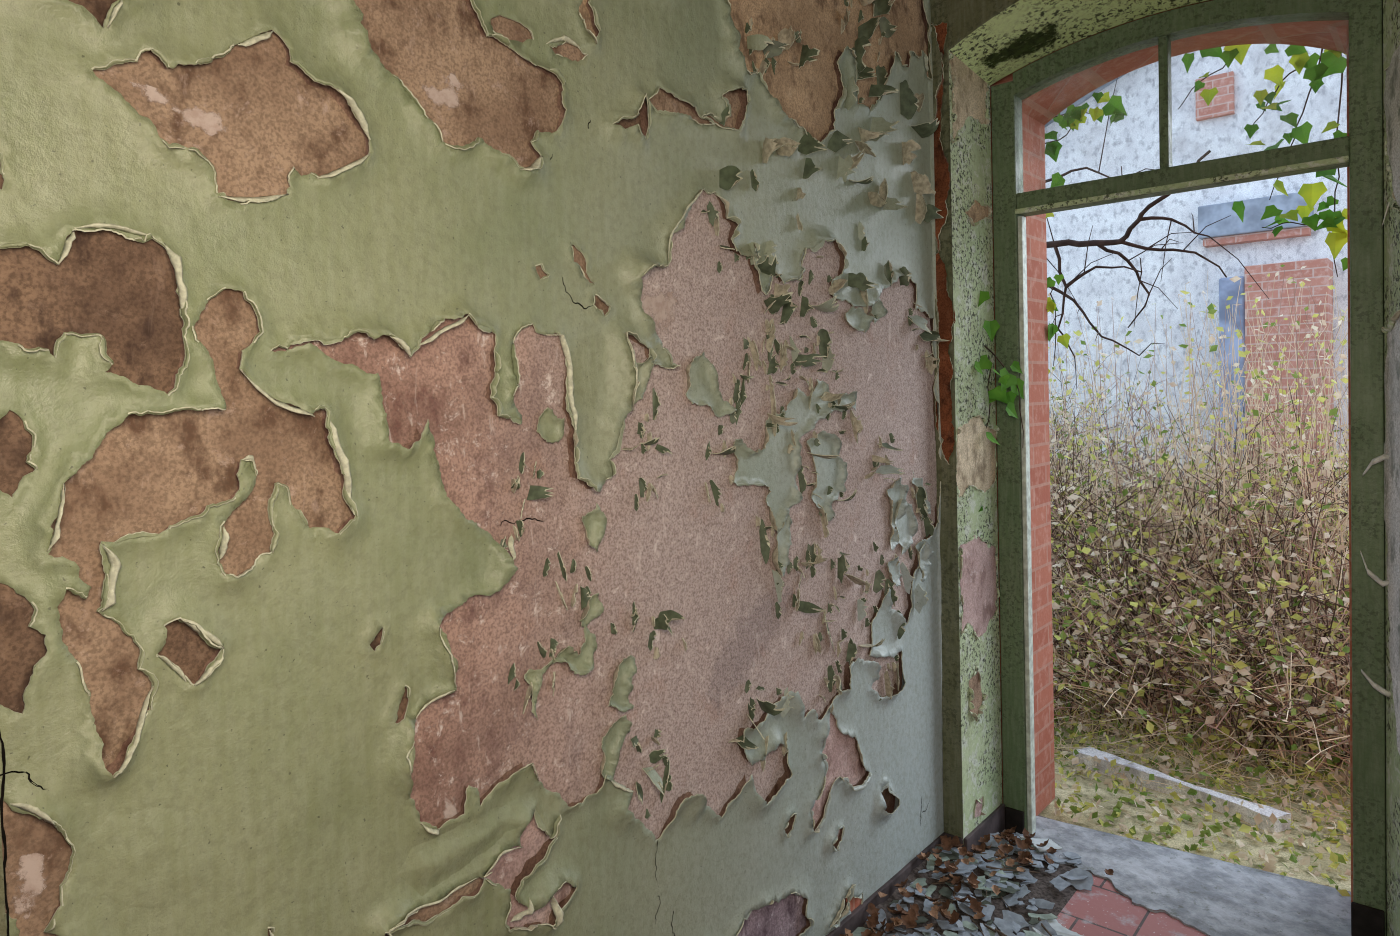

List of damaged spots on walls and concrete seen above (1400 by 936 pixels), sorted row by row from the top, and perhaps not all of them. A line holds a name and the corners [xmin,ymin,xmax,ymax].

peeling [1382,38,1400,226]
peeling [0,0,992,936]
peeling [956,414,1000,497]
peeling [960,535,1000,640]
peeling [1360,310,1400,755]